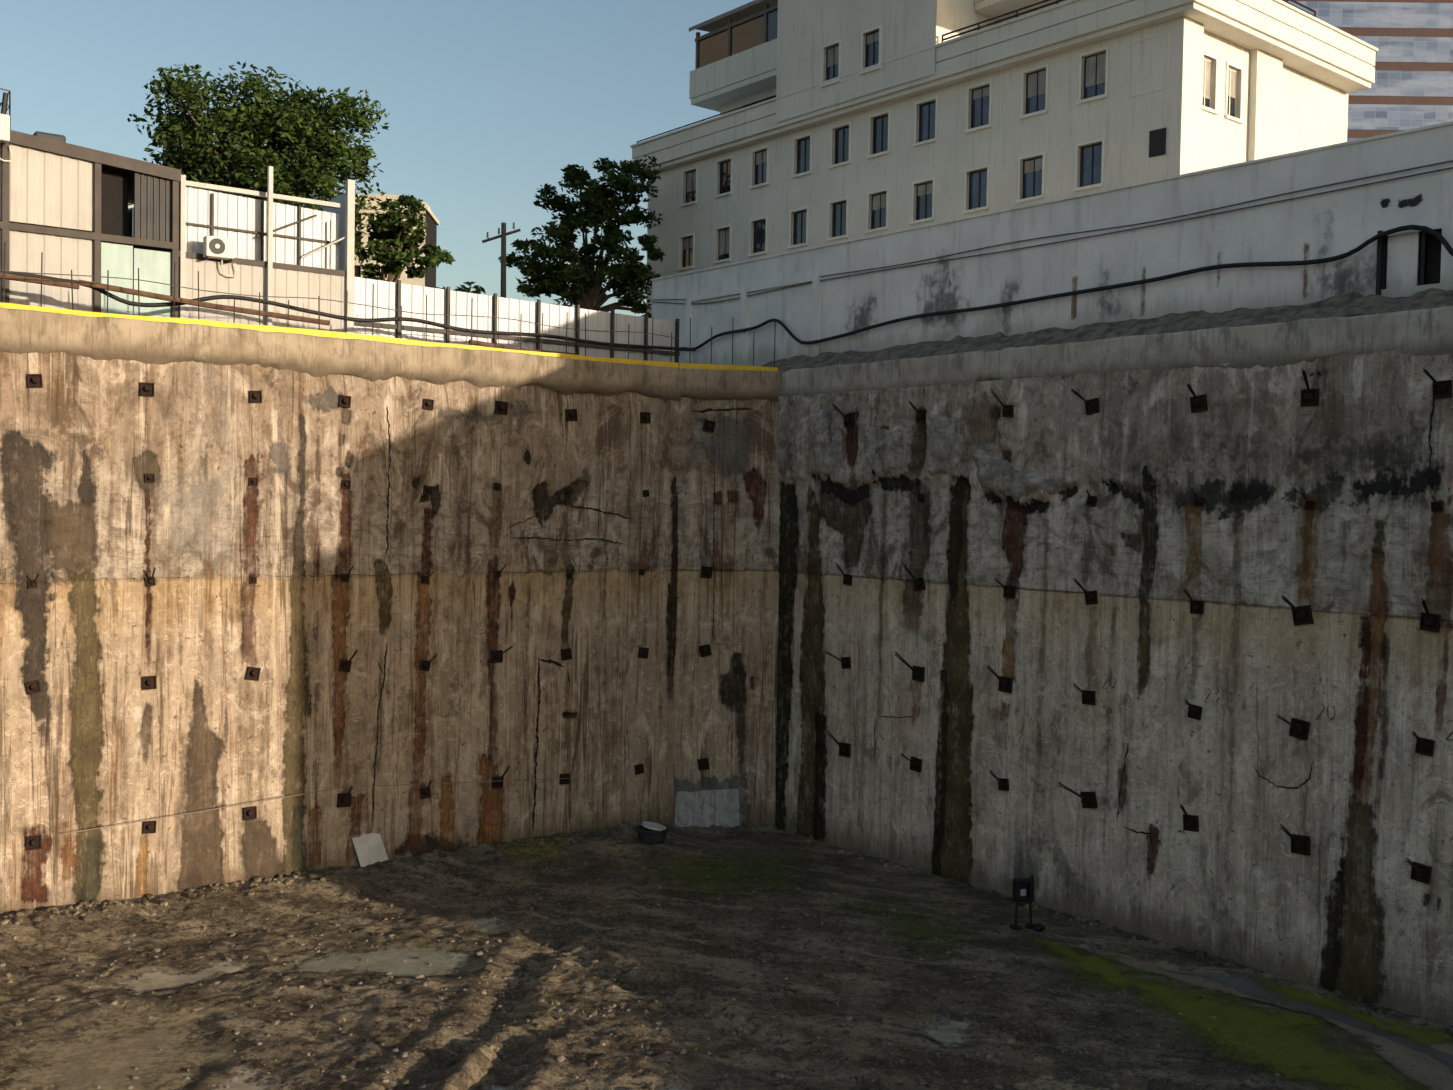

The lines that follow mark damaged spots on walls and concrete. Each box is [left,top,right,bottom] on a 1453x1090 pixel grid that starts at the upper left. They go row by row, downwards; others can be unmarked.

damp [0,430,107,903]
damp [178,414,321,891]
corrosion [408,508,455,852]
corrosion [477,478,505,845]
corrosion [713,467,767,529]
damp [775,474,876,842]
damp [903,478,975,885]
damp [1134,460,1443,694]
corrosion [1319,520,1389,1004]